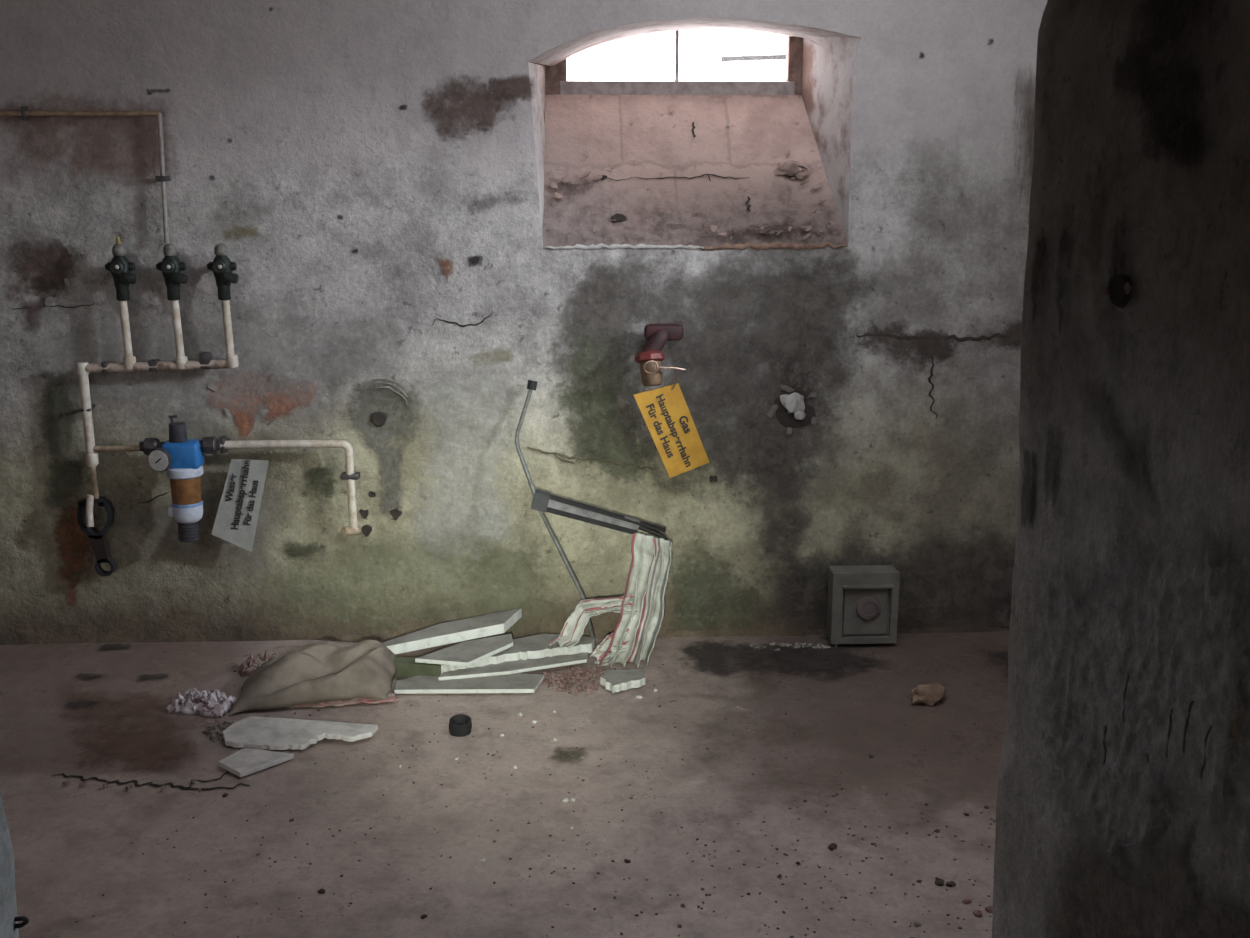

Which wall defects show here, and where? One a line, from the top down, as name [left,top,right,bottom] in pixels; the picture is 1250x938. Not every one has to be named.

leakage [986,229,1067,346]
spalling [767,384,817,436]
crack [896,333,1005,418]
leakage [554,254,1015,680]
leakage [1021,432,1055,526]
crack [52,772,250,793]